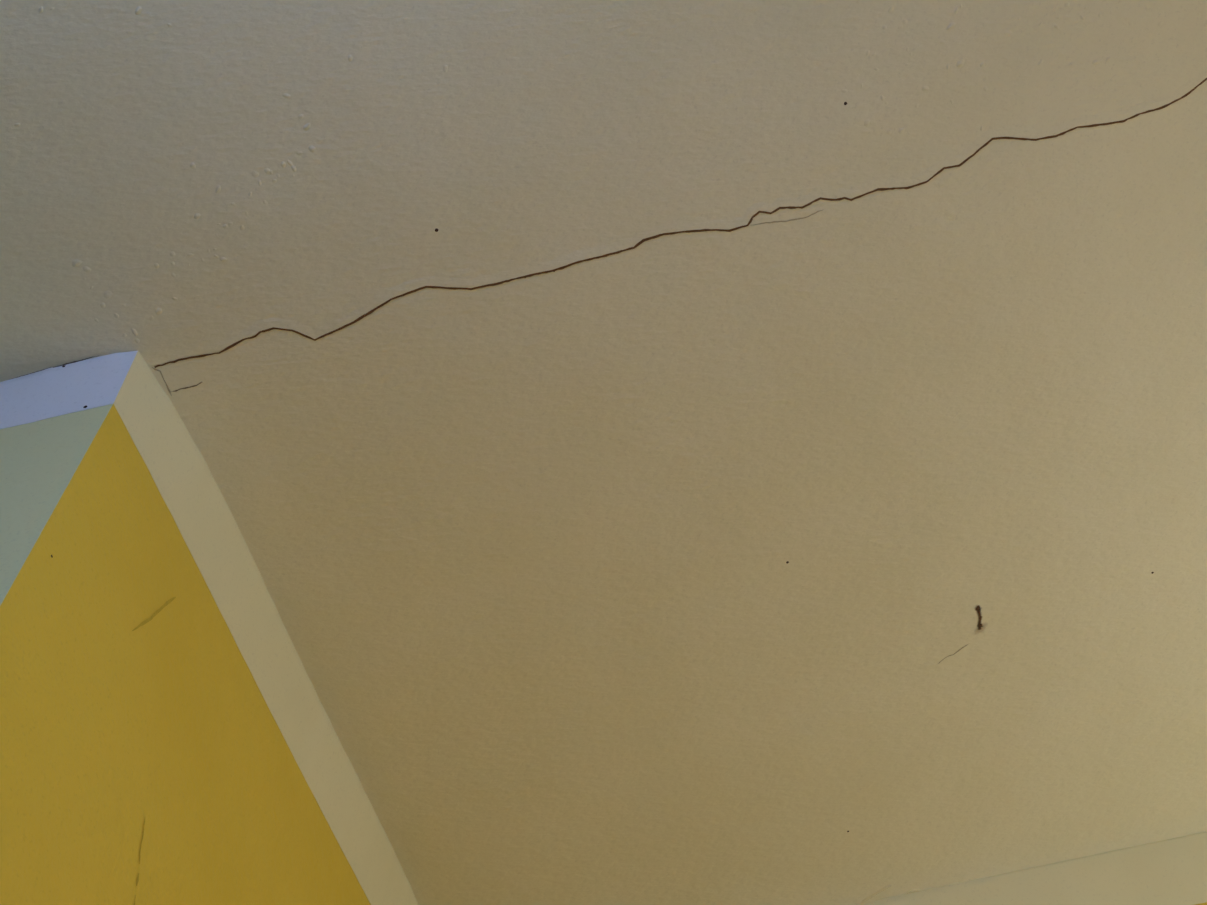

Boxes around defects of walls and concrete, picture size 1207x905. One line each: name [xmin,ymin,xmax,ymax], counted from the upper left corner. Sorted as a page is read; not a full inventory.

crack [151,67,1207,392]